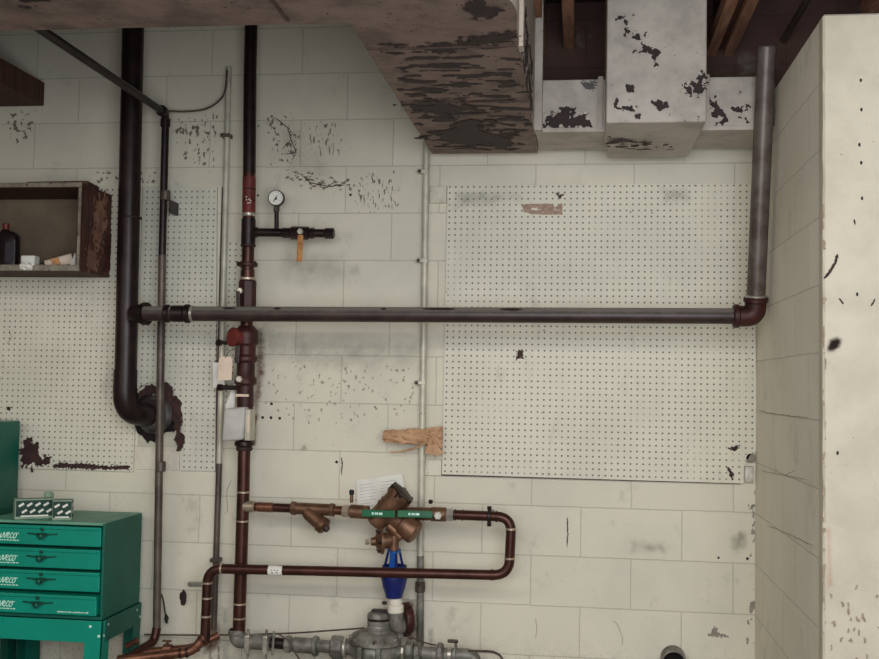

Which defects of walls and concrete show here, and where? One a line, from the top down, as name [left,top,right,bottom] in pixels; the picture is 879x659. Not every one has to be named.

peeling [456,0,505,20]
peeling [615,15,666,67]
peeling [377,6,593,151]
peeling [613,98,641,119]
peeling [651,99,670,115]
peeling [681,70,751,126]
spalling [135,382,185,451]
spalling [830,594,866,650]